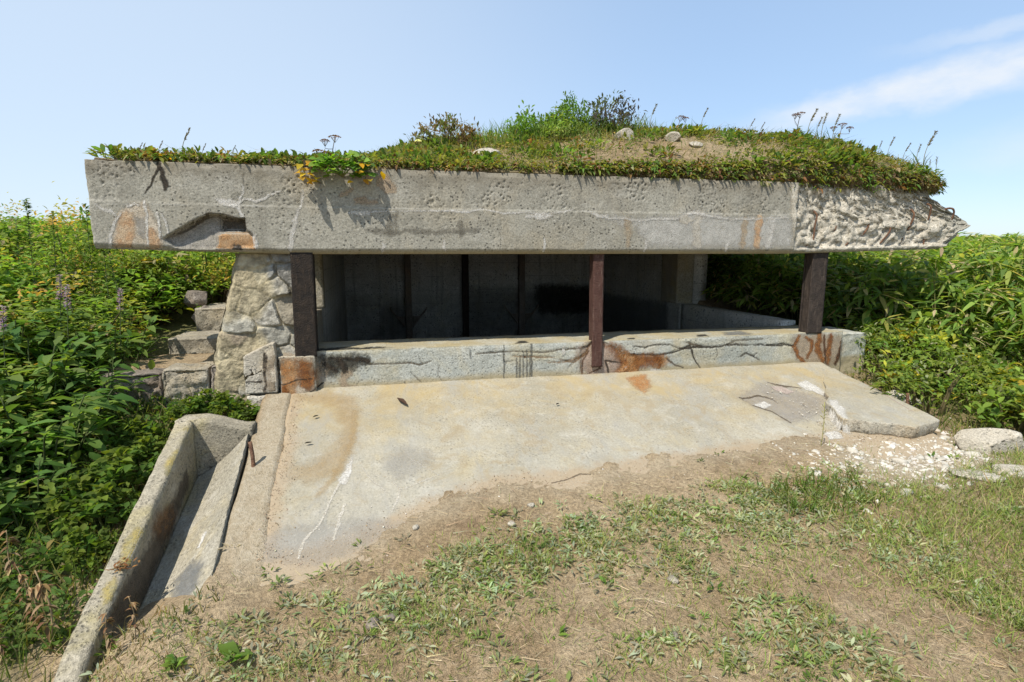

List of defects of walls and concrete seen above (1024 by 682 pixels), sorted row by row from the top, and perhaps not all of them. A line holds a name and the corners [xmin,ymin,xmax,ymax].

rust [108,200,169,249]
spalling [163,212,258,251]
crack [216,175,304,251]
spalling [791,183,955,252]
rust [267,354,324,394]
crack [479,346,588,371]
rust [560,342,667,392]
rust [766,333,842,365]
peeling [739,381,848,440]
damp [298,459,352,559]